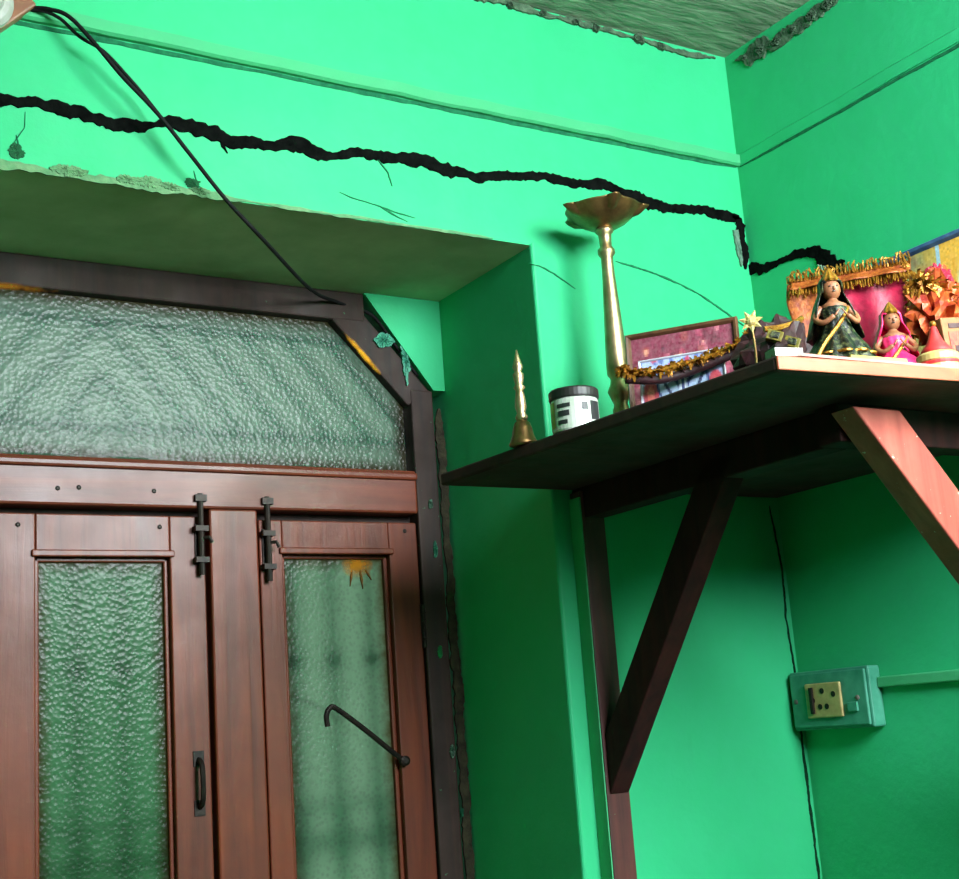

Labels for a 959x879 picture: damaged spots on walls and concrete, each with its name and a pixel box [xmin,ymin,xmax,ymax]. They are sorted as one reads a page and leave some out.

spalling [474,0,716,59]
spalling [735,0,838,67]
crack [0,93,845,276]
crack [529,263,575,289]